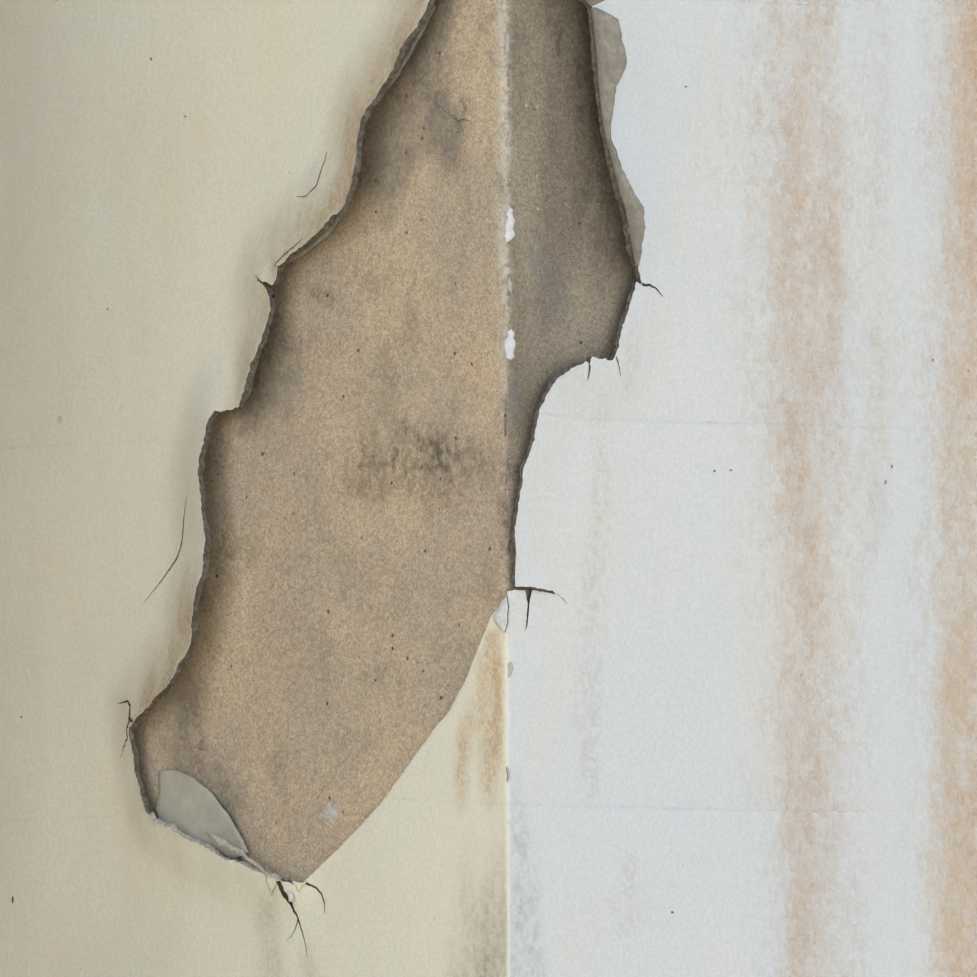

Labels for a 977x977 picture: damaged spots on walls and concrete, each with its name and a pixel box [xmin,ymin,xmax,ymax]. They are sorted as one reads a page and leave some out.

peeling [114,0,672,918]